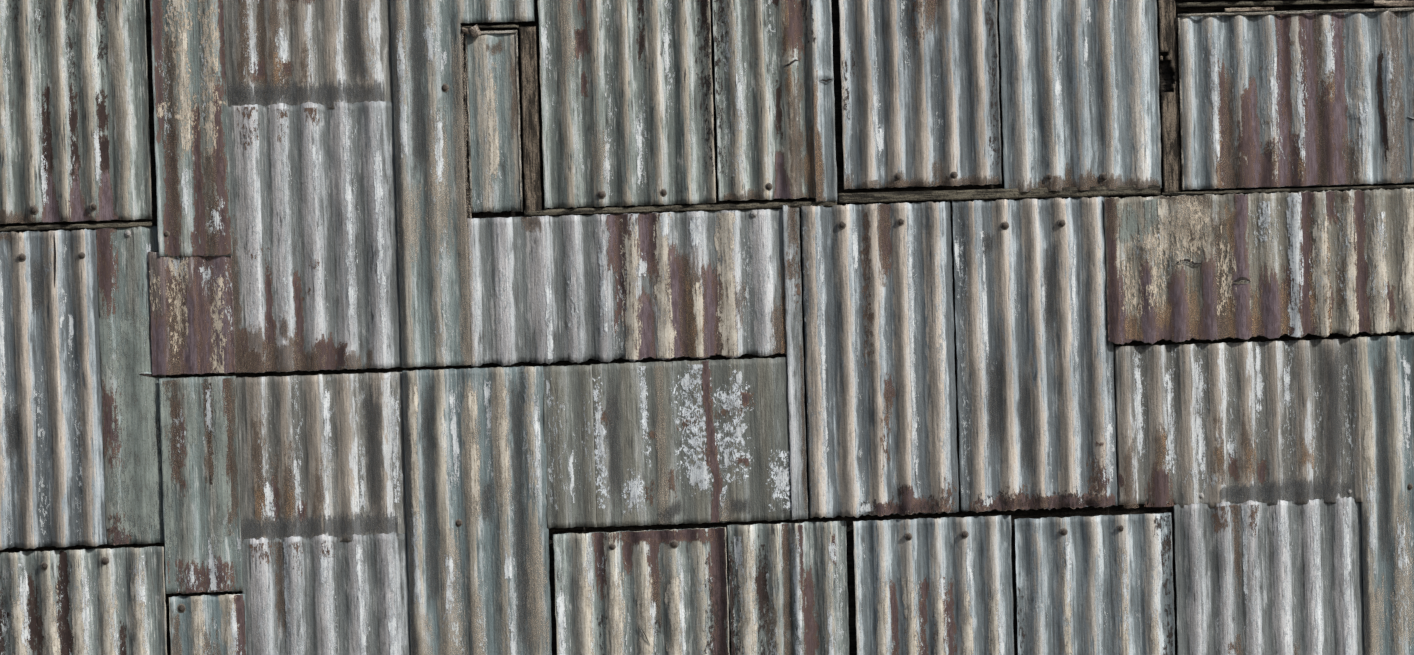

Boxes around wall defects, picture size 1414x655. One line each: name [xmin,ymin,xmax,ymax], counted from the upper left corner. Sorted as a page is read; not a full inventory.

peeling [396,24,409,173]
rust [845,13,1396,367]
rust [102,380,125,469]
rust [167,555,246,655]
rust [151,0,373,632]
peeling [257,542,370,655]
peeling [386,375,426,613]
peeling [440,212,803,655]
peeling [803,210,830,512]
peeling [906,205,1005,507]
rust [860,424,1175,517]
rust [1211,406,1268,485]